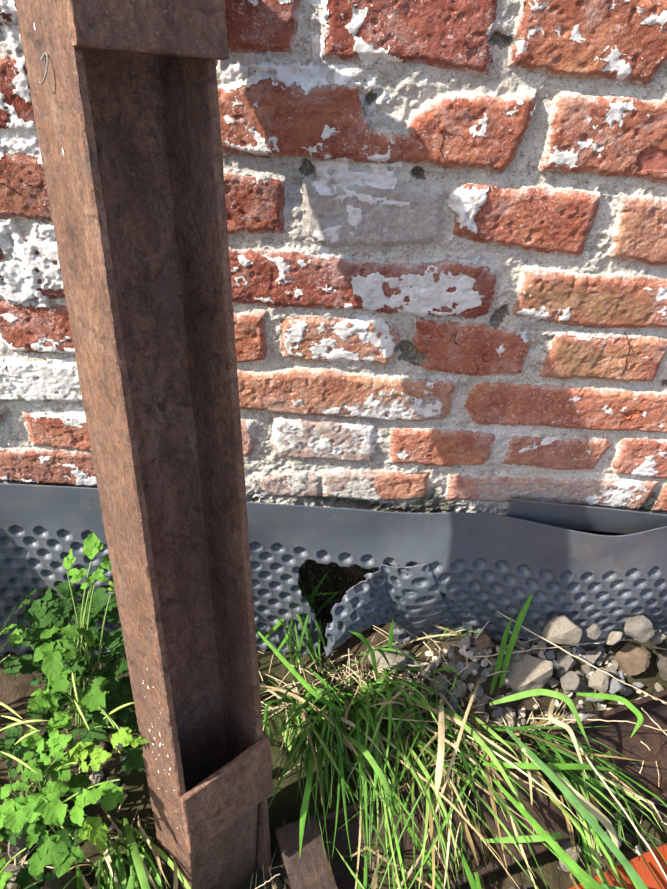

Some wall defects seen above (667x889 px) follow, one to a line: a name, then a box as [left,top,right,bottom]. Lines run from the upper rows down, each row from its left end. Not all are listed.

flaking render [0,219,64,322]
peeling [0,333,86,428]
peeling [232,255,253,287]
peeling [281,265,485,363]
crack [620,332,635,378]